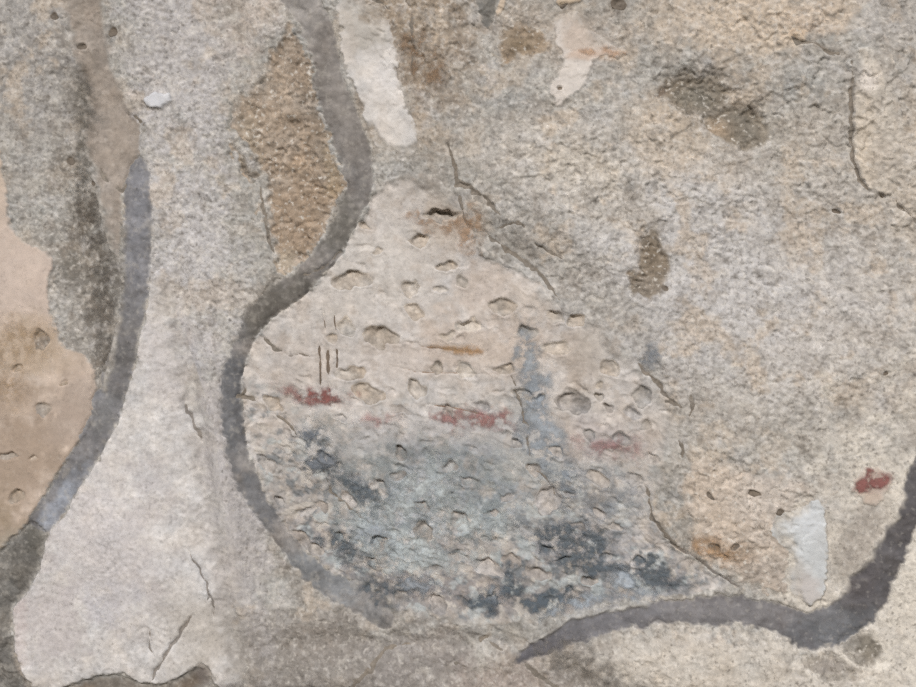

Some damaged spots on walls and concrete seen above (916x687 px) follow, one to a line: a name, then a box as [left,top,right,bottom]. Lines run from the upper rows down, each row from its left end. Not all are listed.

spalling [224,20,347,276]
crack [791,36,916,223]
spalling [33,329,50,350]
crack [148,554,215,680]